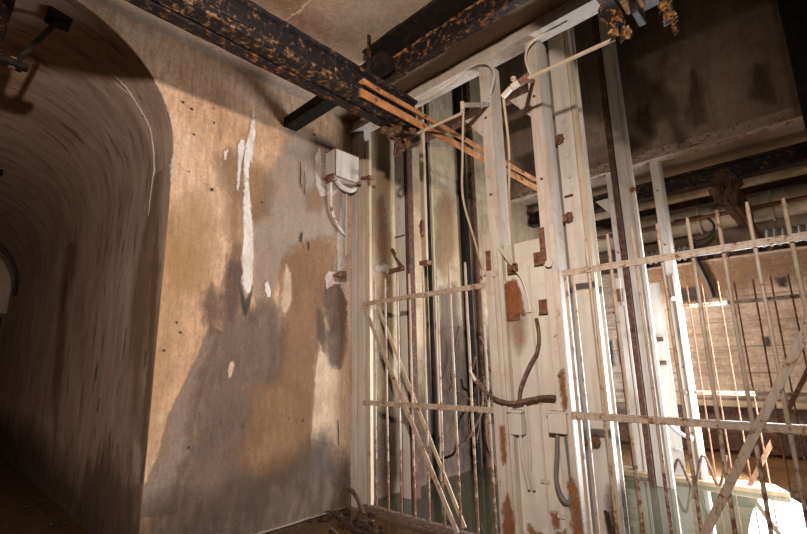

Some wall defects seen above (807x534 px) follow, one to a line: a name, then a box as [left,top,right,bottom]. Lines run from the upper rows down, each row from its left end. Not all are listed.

crack [285,0,313,21]
leakage [0,111,351,534]
peeling [288,148,352,475]
corrosion [506,279,525,345]
corrosion [558,368,567,412]
corrosion [501,495,515,534]
corrosion [551,477,584,534]